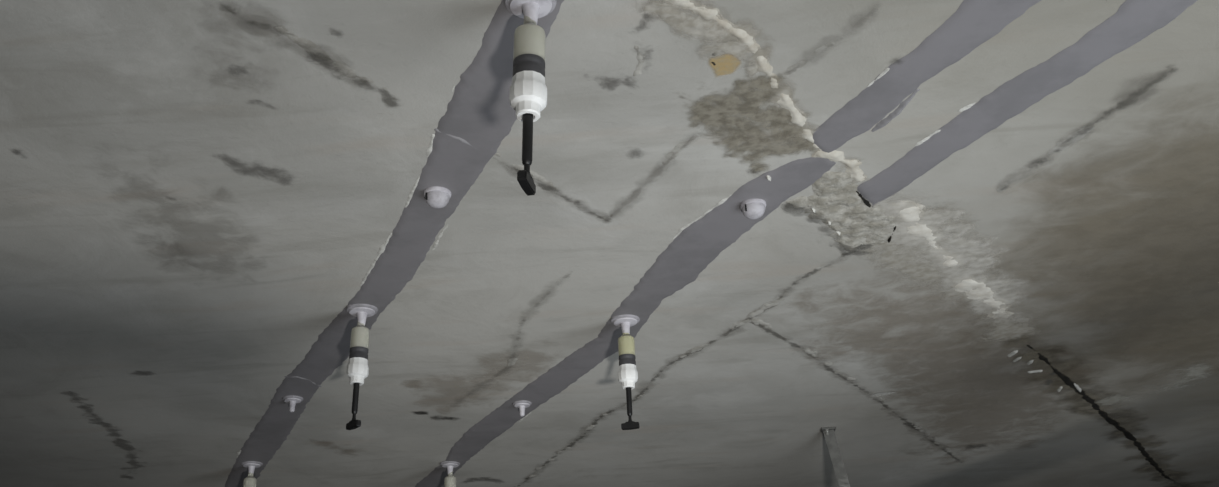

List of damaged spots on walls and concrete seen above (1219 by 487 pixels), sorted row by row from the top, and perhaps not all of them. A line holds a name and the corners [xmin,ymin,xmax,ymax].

rust [710,53,740,75]
leakage [644,0,867,182]
leakage [856,200,1038,341]
crack [1007,336,1192,487]